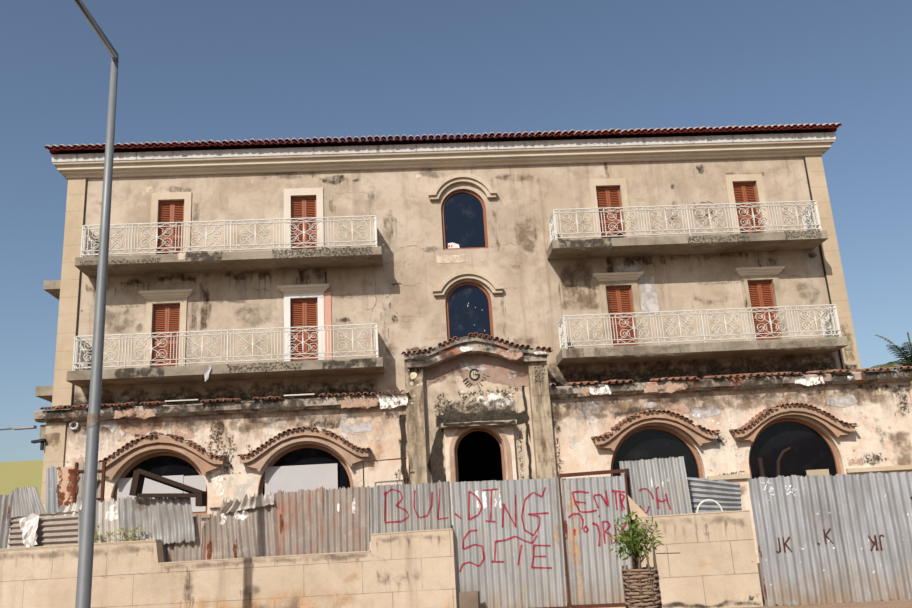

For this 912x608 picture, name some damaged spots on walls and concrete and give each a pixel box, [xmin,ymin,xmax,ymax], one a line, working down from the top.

water stain [558,238,612,250]
water stain [193,290,209,328]
water stain [562,264,610,308]
peeling [340,346,528,409]
water stain [535,328,912,474]
water stain [428,386,532,484]